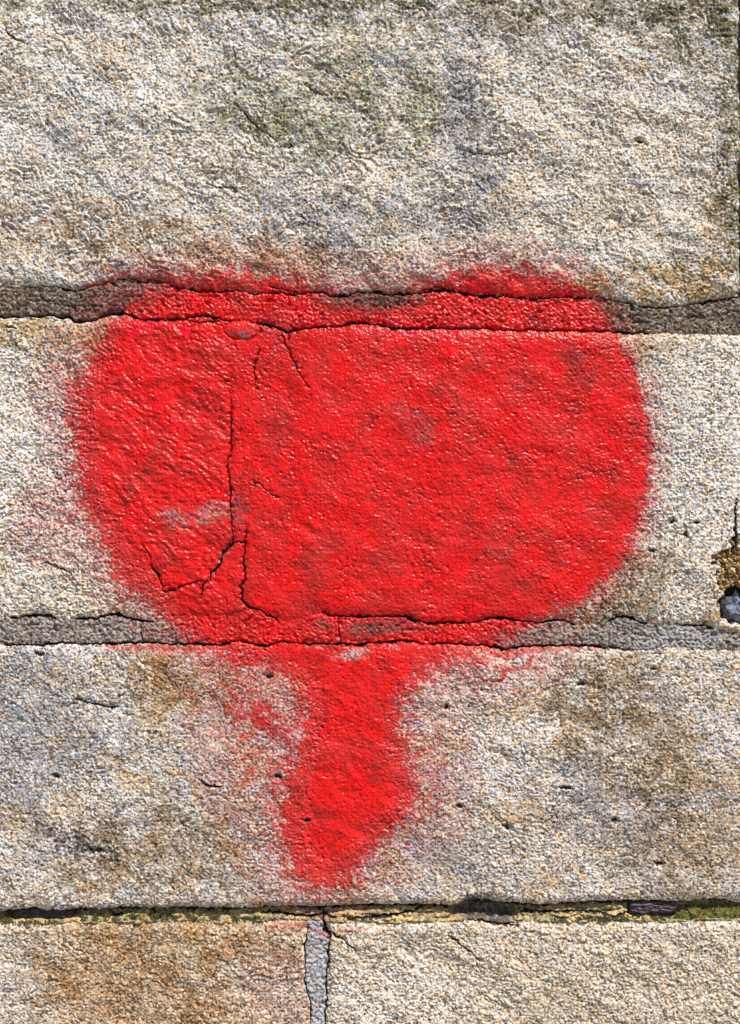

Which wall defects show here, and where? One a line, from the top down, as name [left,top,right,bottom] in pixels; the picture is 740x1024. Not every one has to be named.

crack [5,413,647,652]
crack [674,622,714,630]